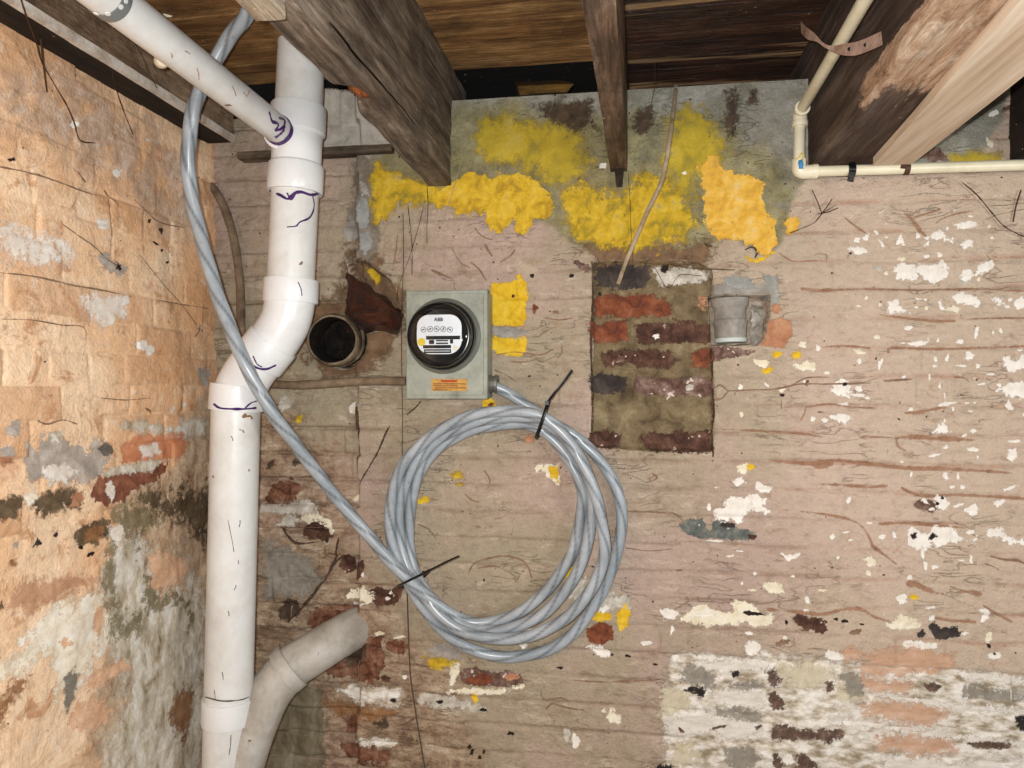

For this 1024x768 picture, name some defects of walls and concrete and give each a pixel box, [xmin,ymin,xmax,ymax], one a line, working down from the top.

spalling [368,103,870,455]
peeling [847,215,1024,347]
water stain [119,414,209,441]
peeling [928,326,1024,462]
peeling [679,463,773,558]
peeling [878,472,1024,570]
water stain [0,638,44,681]
water stain [63,671,81,715]
water stain [99,477,209,768]
spalling [279,554,403,628]
spalling [416,642,525,713]
peeling [656,572,1024,768]